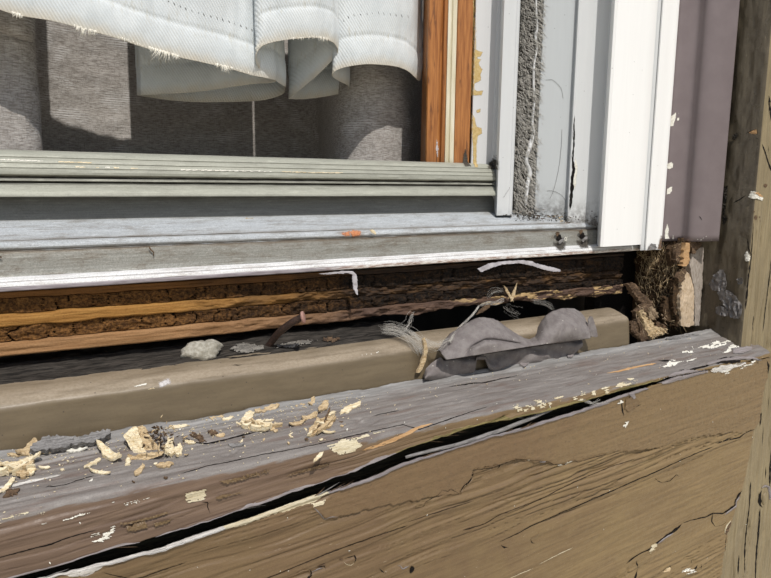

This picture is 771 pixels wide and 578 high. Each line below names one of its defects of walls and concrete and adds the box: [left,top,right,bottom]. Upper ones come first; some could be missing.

crack [745,223,771,329]
peeling [657,340,752,384]
peeling [513,396,563,412]
peeling [573,378,640,428]
peeling [327,431,384,455]
crack [0,356,771,578]
peeling [185,489,206,503]